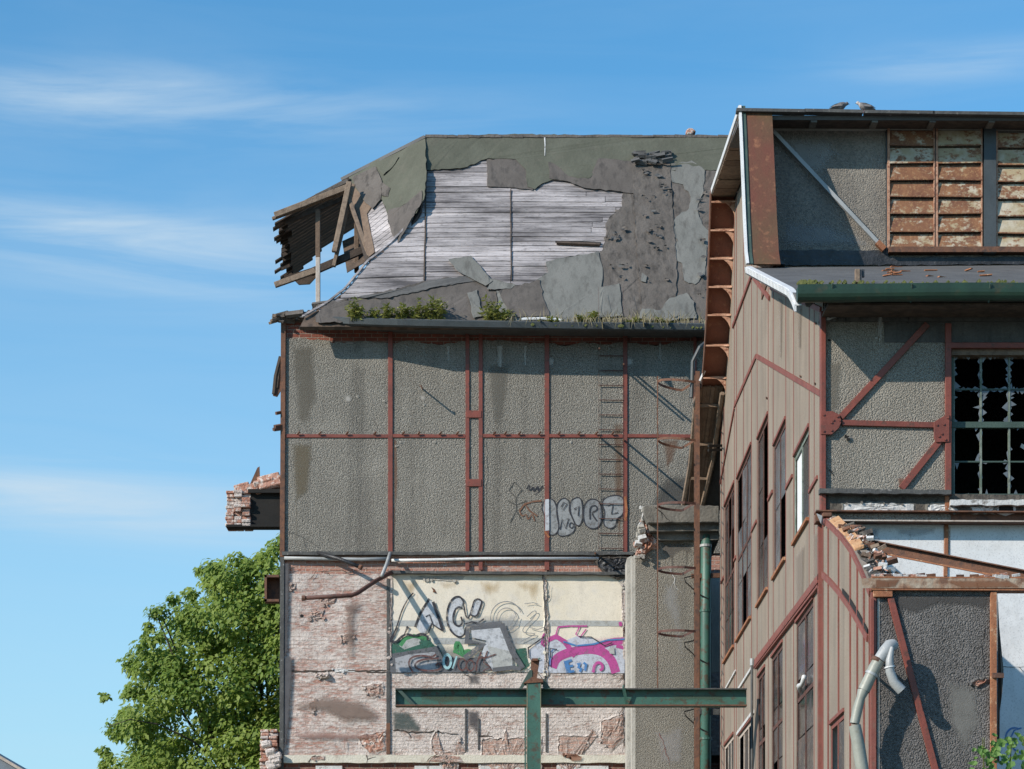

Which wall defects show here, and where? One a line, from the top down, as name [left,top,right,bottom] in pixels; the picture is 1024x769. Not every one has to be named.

water stain [296,447,309,495]
spalling [633,506,659,559]
spalling [817,494,1024,578]
spalling [300,598,337,621]
water stain [284,563,376,748]
spalling [360,681,385,699]
spalling [357,730,386,755]
spalling [428,729,465,769]
spalling [478,729,527,769]
spalling [557,713,625,769]